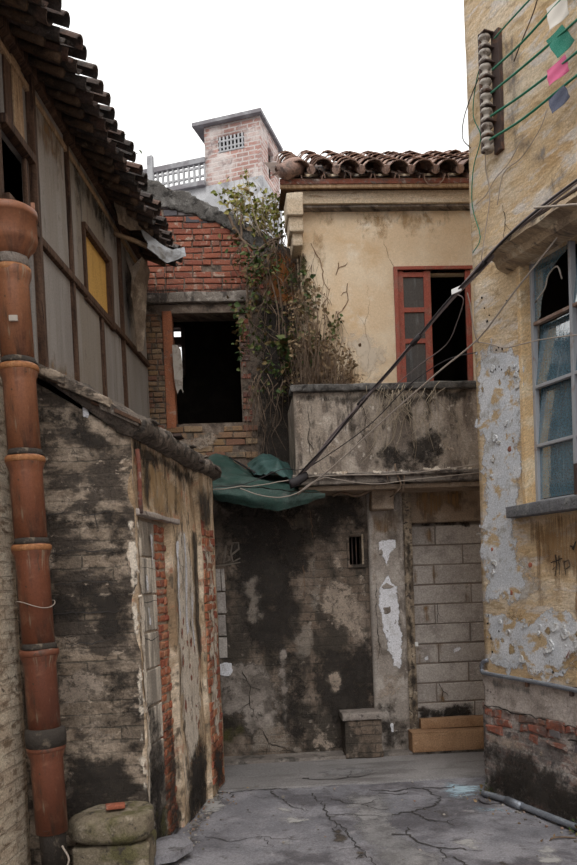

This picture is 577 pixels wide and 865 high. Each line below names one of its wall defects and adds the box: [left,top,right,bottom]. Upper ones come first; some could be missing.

damp [373,428,472,474]
damp [64,502,129,555]
peeling [475,338,577,684]
damp [58,670,137,708]
damp [64,694,225,840]
flaking render [201,520,225,787]
damp [221,497,428,749]
crack [217,770,483,865]
peeling [379,583,401,626]
damp [411,692,471,718]
damp [446,735,577,823]
flaking render [485,709,577,752]